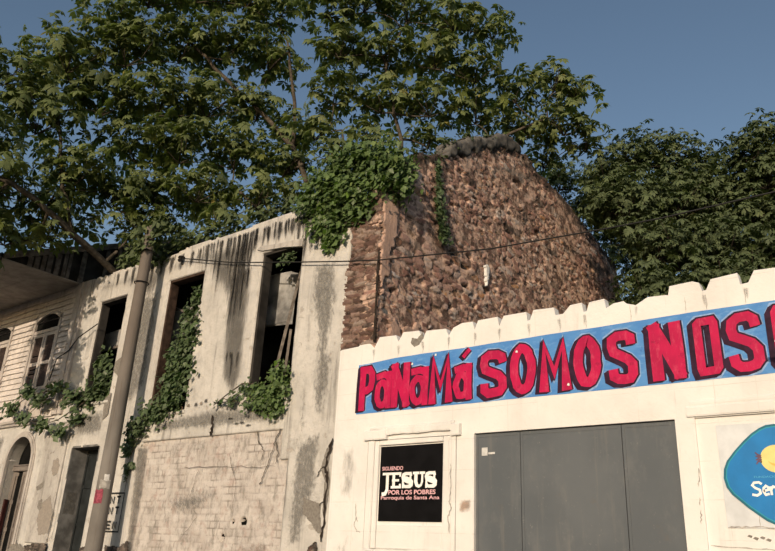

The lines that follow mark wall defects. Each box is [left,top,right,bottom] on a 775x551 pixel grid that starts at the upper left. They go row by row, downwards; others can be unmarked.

damp [128,216,317,399]
damp [316,266,333,404]
spalling [6,481,53,551]
crack [185,429,281,532]
spalling [302,447,329,551]
crack [317,438,333,542]